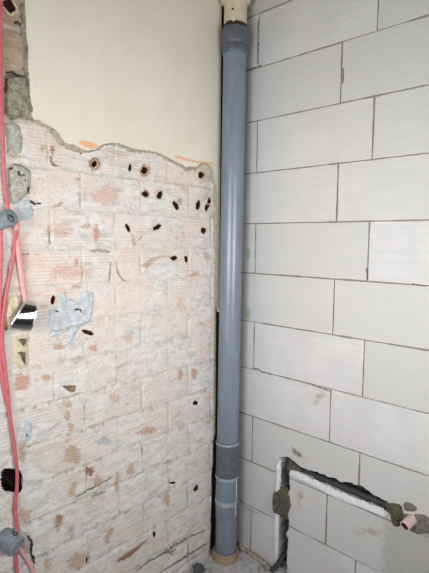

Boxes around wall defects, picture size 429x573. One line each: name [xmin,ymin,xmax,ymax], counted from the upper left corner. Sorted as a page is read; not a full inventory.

flaking render [3,0,219,308]
spalling [17,338,28,364]
peeling [16,374,29,390]
crack [75,477,112,499]
crack [136,530,207,573]